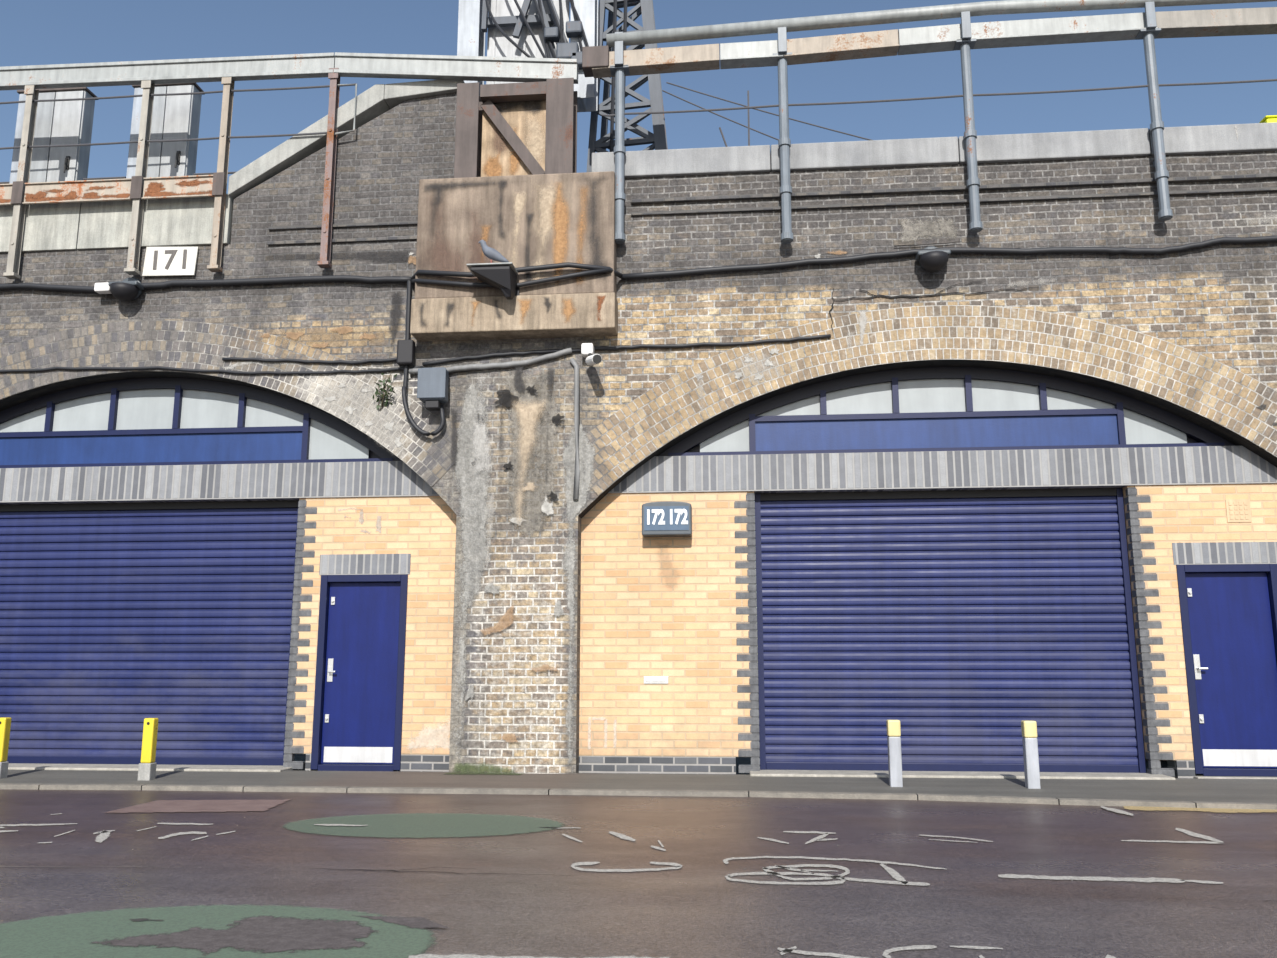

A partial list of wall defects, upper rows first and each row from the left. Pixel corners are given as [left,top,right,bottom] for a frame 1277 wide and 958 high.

corrosion [0,179,212,203]
corrosion [515,186,586,277]
leakage [473,420,501,471]
leakage [514,367,553,465]